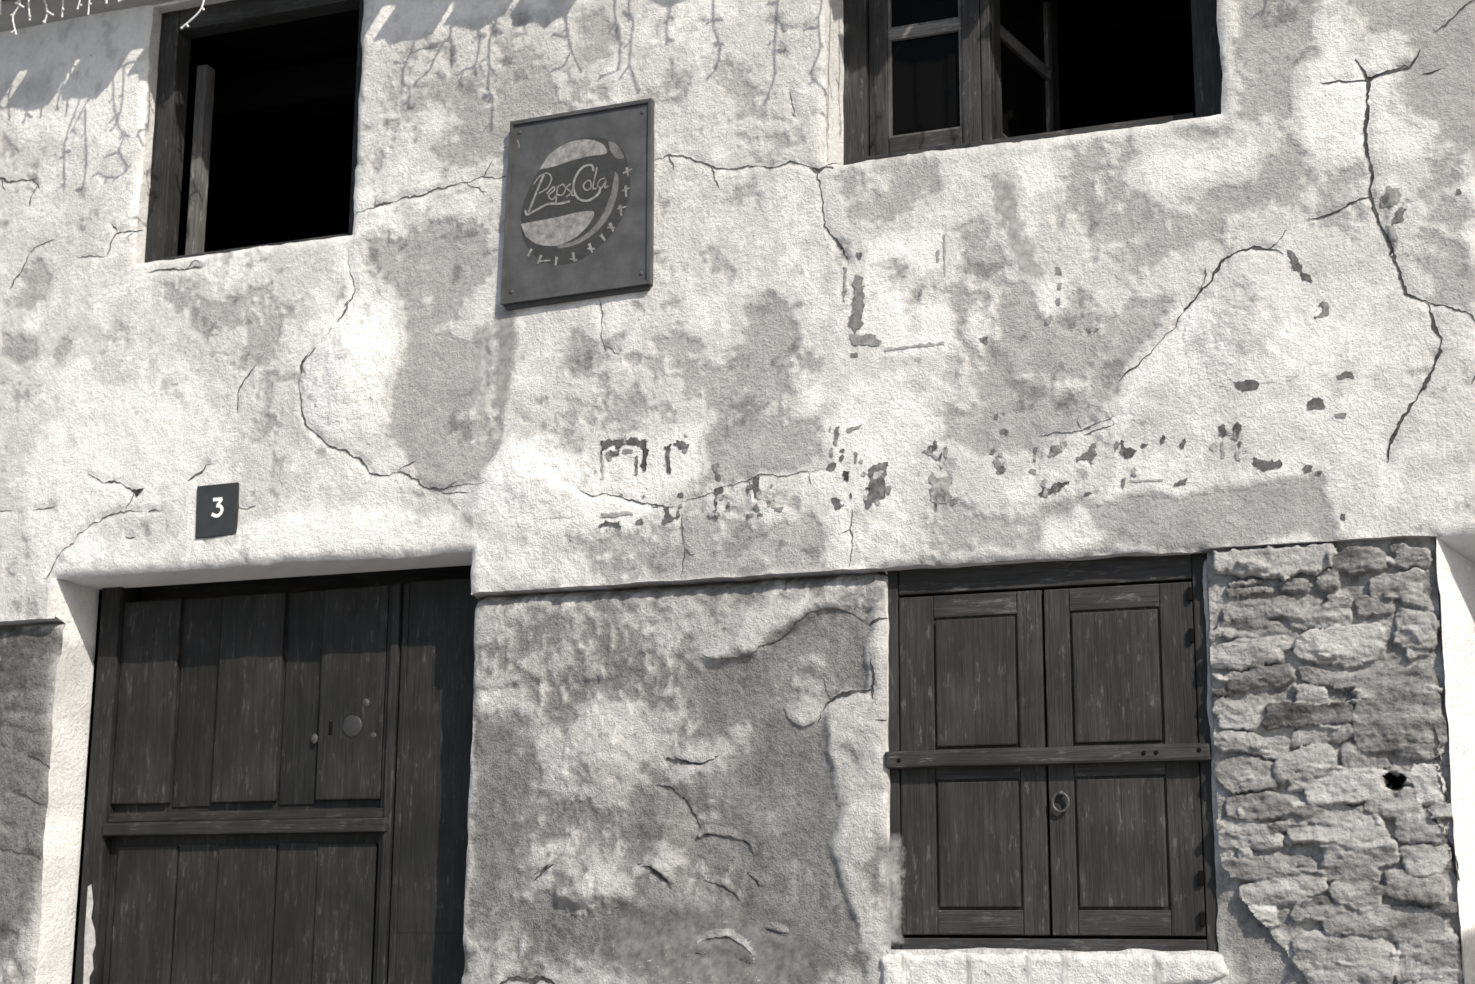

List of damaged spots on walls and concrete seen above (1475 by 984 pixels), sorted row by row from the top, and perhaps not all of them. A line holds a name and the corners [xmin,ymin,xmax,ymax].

crack [355,160,506,215]
crack [655,154,849,262]
crack [1119,0,1475,463]
peeling [842,252,945,357]
crack [298,252,484,494]
damp [476,309,517,423]
peeling [598,494,643,532]
peeling [826,425,892,510]
peeling [1029,441,1188,497]
spalling [1210,422,1283,471]
crack [818,617,889,722]
crack [657,756,762,887]